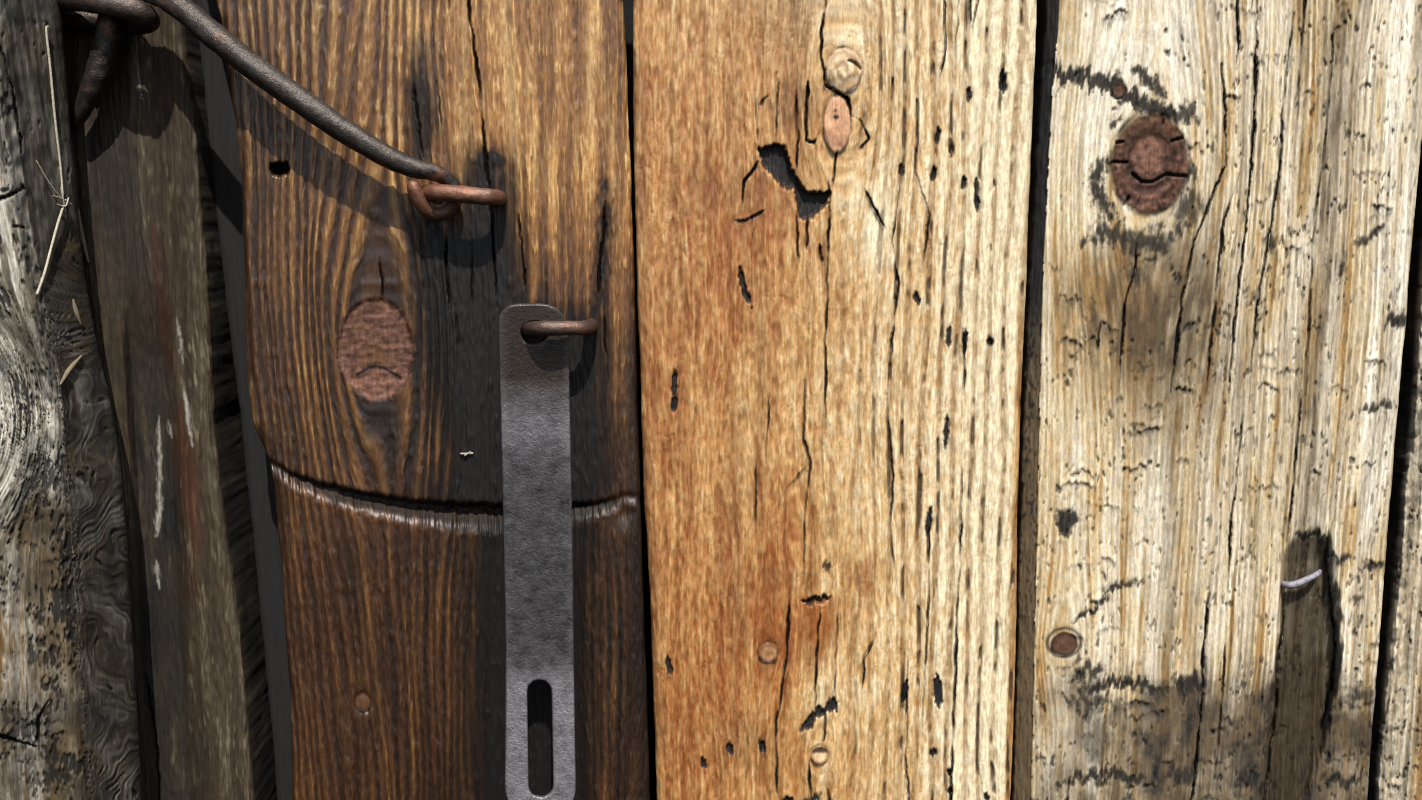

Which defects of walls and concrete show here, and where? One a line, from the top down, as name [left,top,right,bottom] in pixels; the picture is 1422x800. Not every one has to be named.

crack [941,0,979,71]
crack [0,47,22,152]
crack [0,190,24,228]
crack [737,163,762,222]
crack [760,5,931,485]
crack [1174,0,1335,379]
crack [752,470,760,517]
crack [887,420,895,514]
crack [1229,423,1243,561]
crack [0,704,46,746]